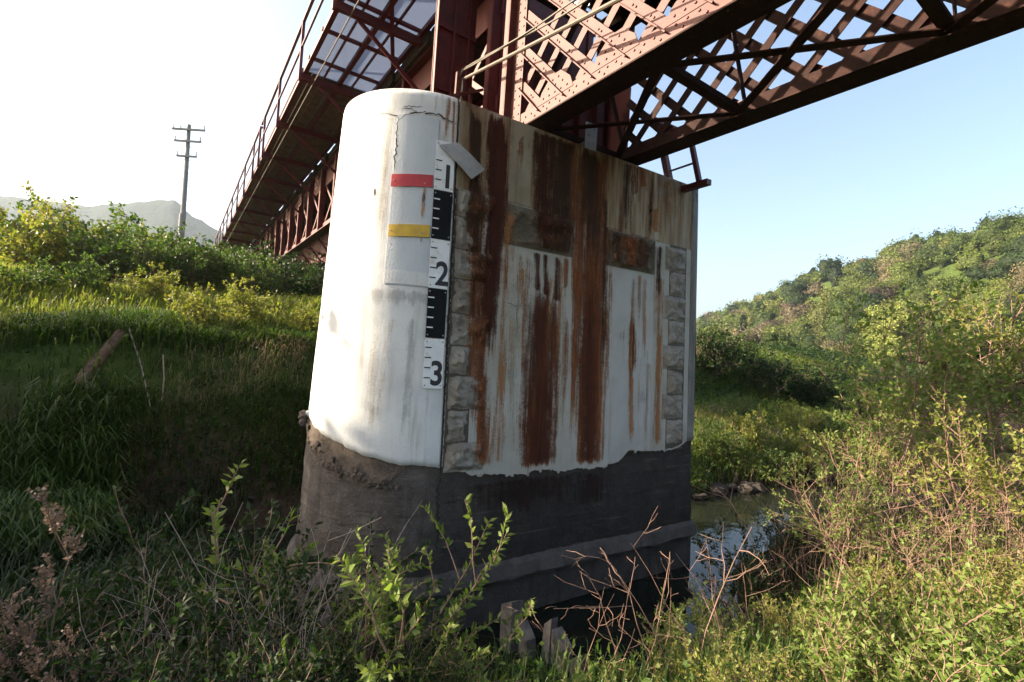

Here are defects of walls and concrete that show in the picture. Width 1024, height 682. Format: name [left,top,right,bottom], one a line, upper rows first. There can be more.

crack [379,103,483,549]
corrosion [445,98,616,467]
corrosion [629,276,646,437]